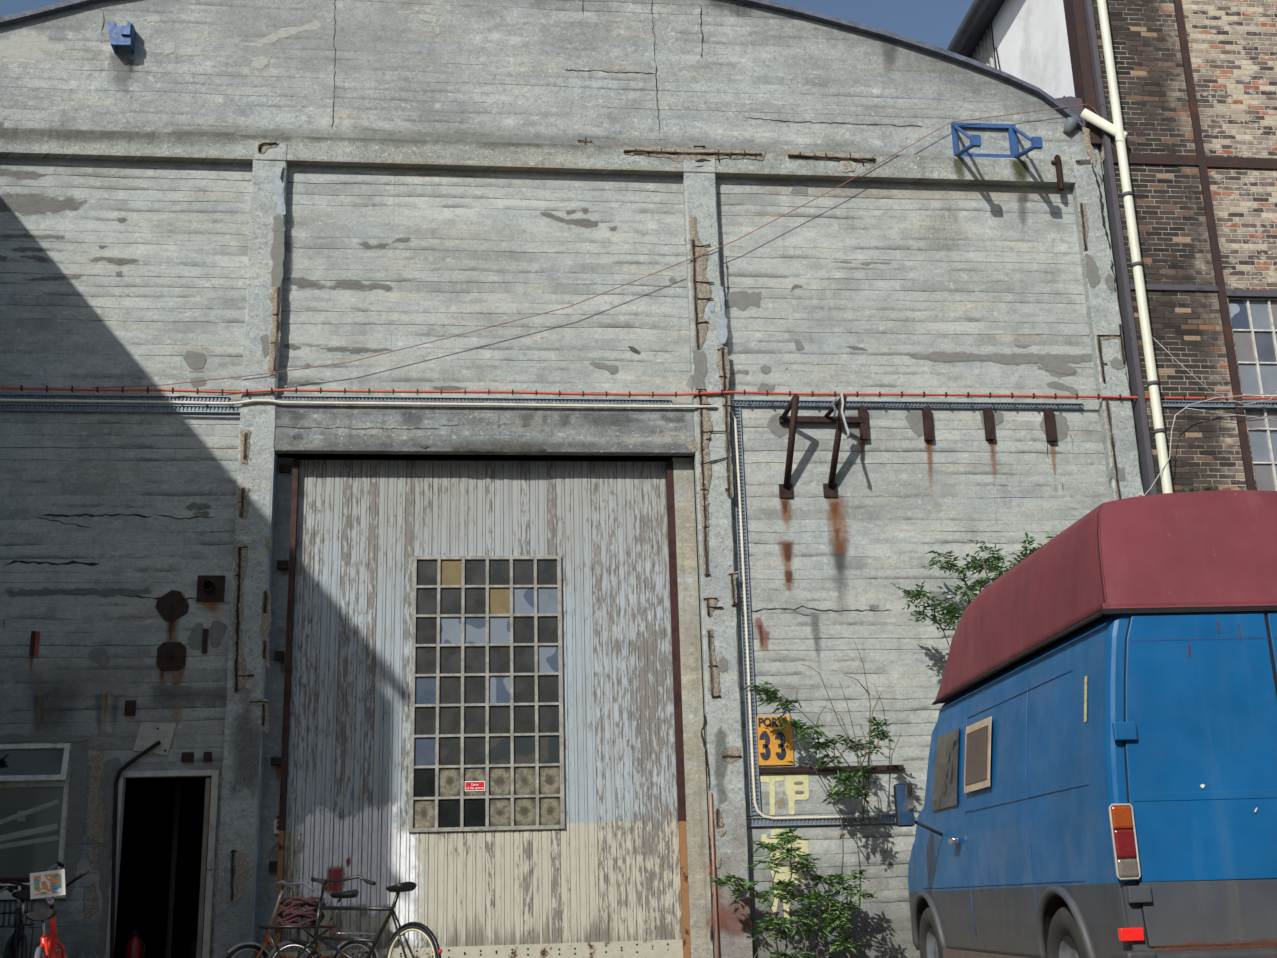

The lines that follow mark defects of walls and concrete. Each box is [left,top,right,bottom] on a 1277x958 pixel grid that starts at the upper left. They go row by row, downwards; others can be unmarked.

crack [329,1,337,127]
crack [564,0,660,135]
crack [37,513,217,528]
crack [5,559,98,567]
corrosion [784,544,792,582]
crack [129,593,196,601]